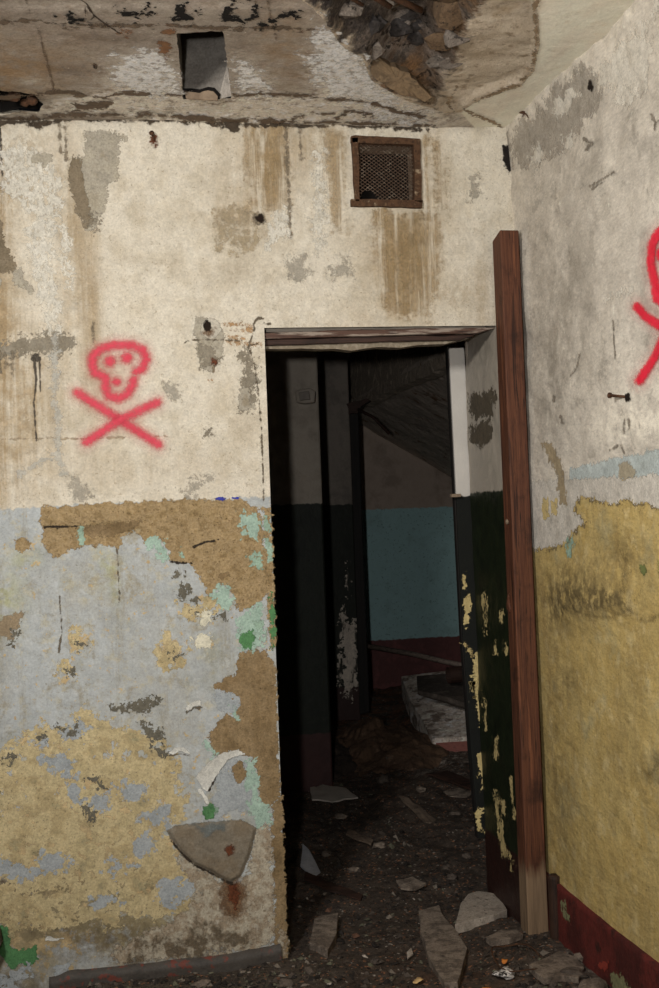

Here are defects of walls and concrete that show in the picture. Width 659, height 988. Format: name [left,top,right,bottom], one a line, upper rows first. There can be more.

crack [0,0,539,133]
damp [211,126,343,258]
damp [0,122,77,478]
damp [375,208,438,314]
damp [467,387,497,449]
peeling [529,461,659,558]
peeling [0,475,290,988]
peeling [336,562,358,704]
peeling [461,643,487,731]
peeling [461,574,508,656]
peeling [474,735,516,872]
rust [219,879,247,917]